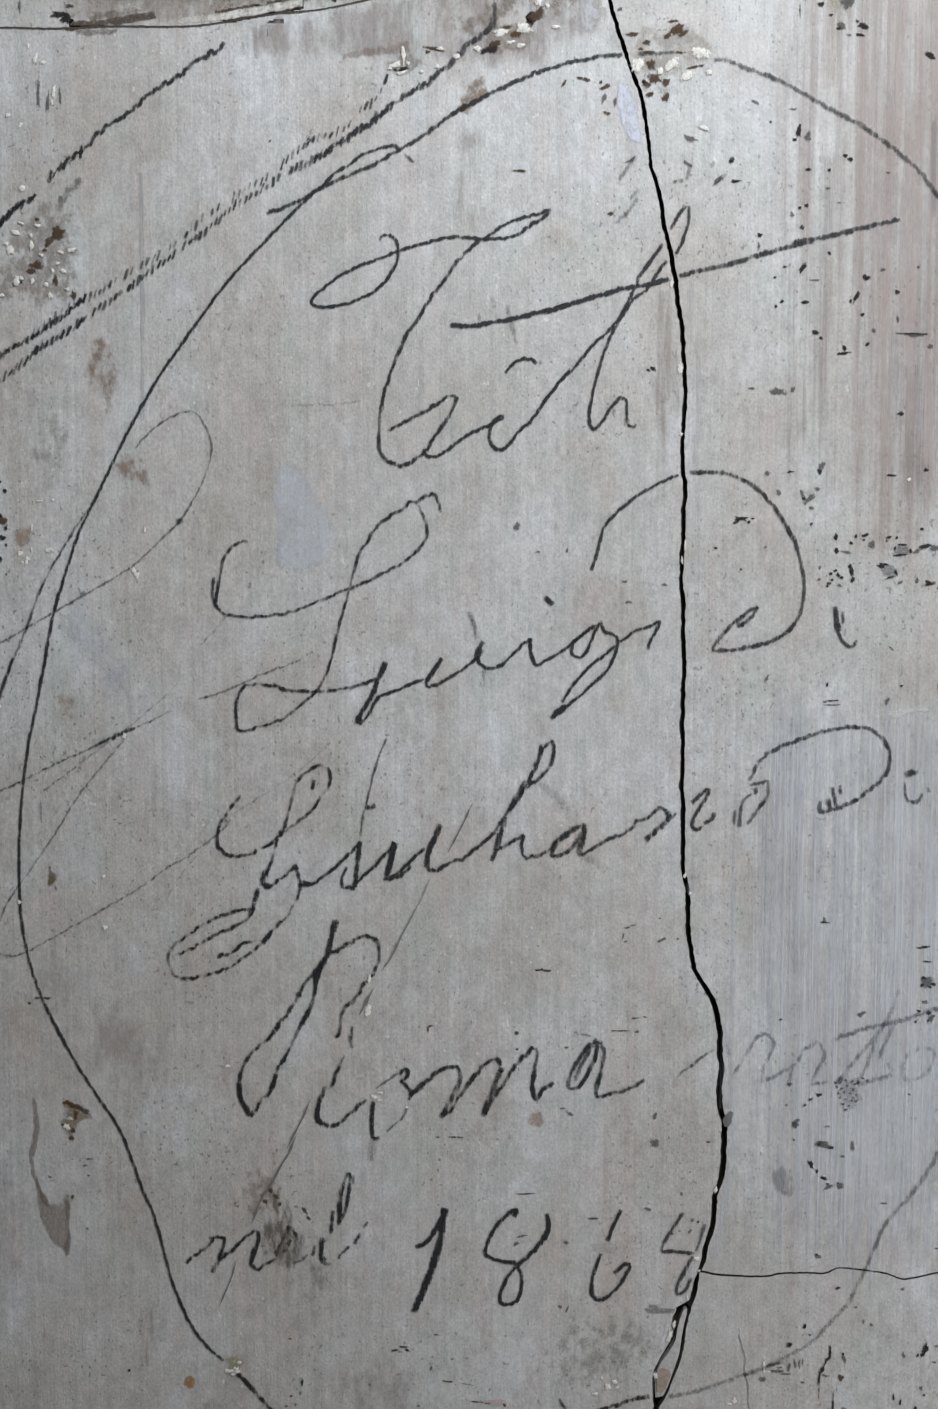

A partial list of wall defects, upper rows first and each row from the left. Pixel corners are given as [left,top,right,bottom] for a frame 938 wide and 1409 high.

crack [608,0,938,1409]